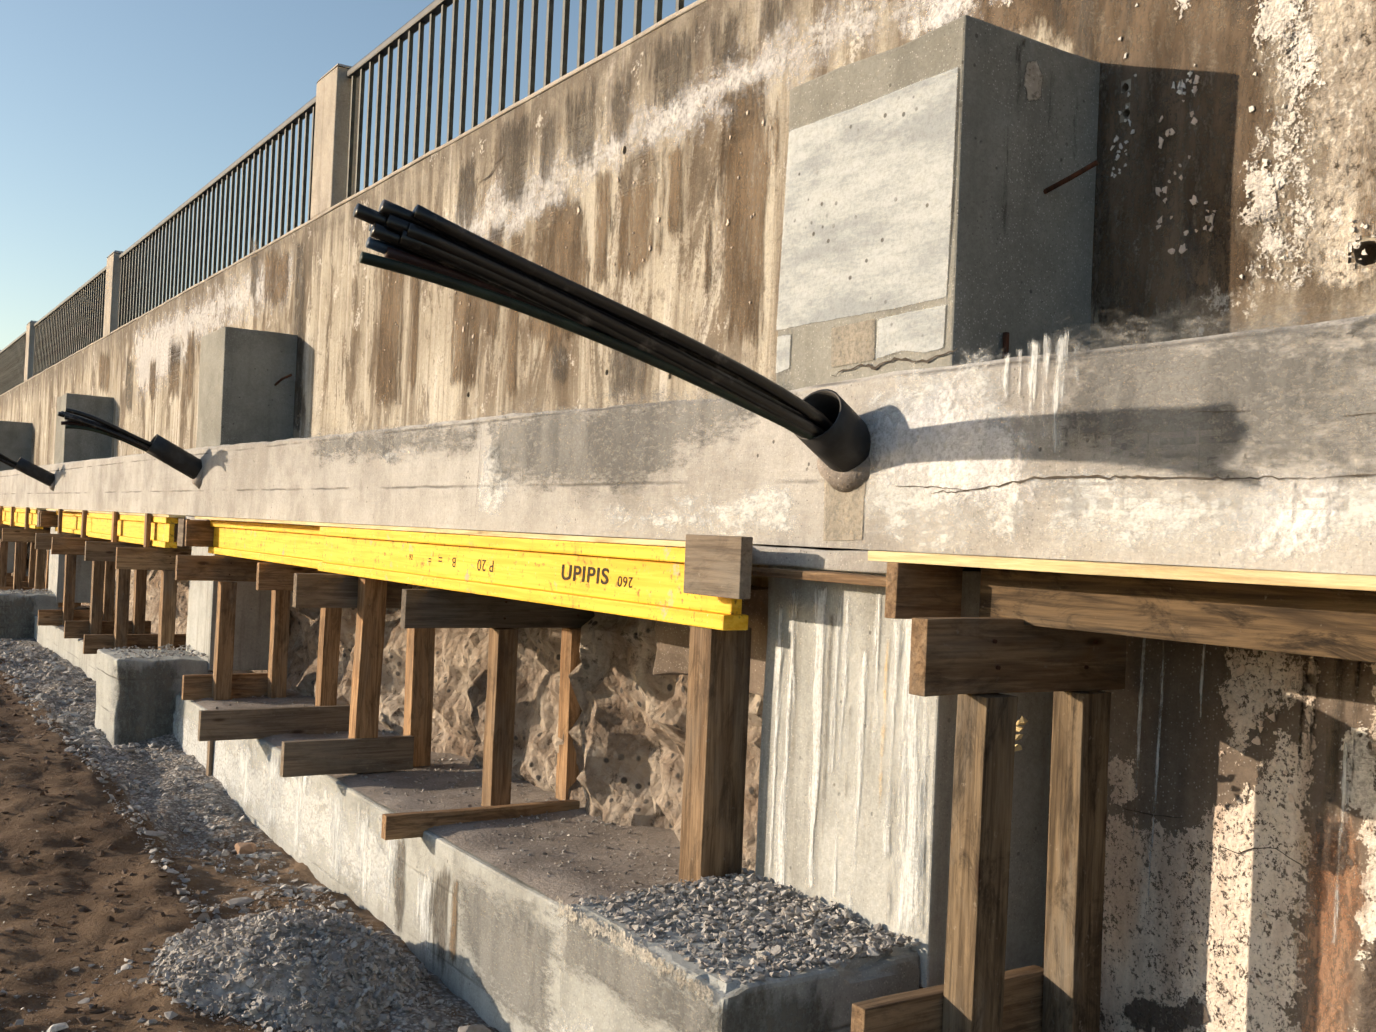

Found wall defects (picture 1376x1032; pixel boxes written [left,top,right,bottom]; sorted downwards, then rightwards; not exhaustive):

leakage [99,241,305,431]
leakage [375,269,419,407]
leakage [317,350,753,511]
leakage [450,0,1376,556]
crack [897,474,1376,494]
peeling [1099,647,1321,1032]
corrosion [1298,819,1366,1032]
peeling [1338,663,1376,1032]